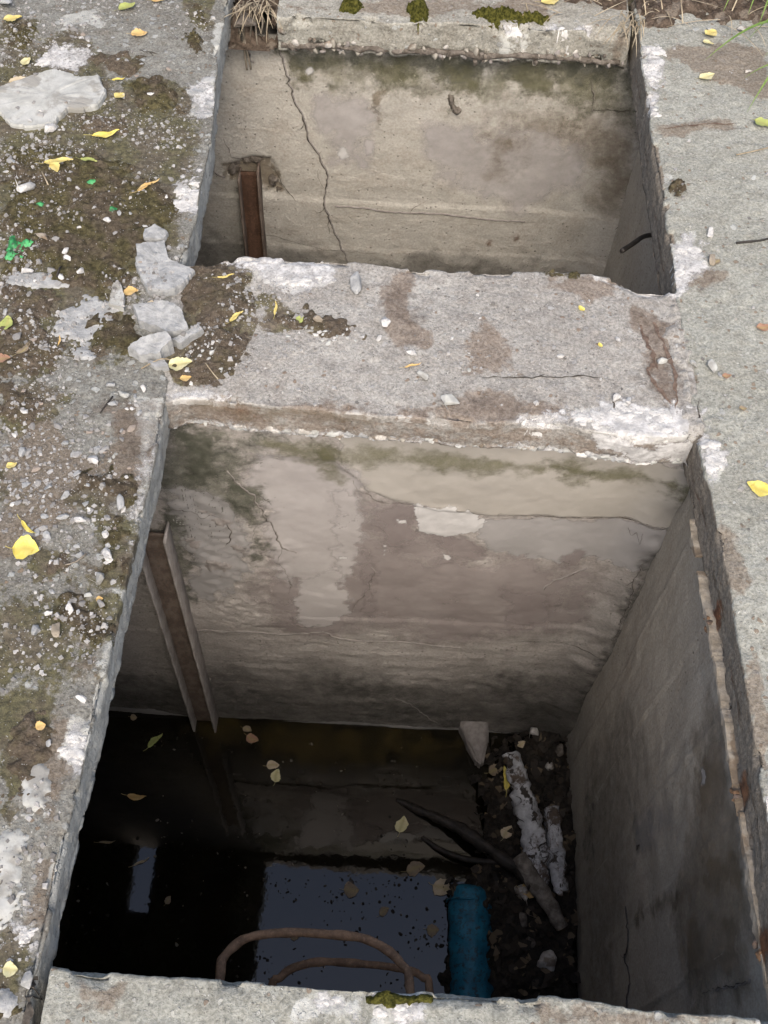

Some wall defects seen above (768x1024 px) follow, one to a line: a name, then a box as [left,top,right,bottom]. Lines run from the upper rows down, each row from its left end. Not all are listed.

water stain [292,49,324,81]
water stain [389,55,488,92]
water stain [502,23,631,97]
crack [591,76,642,112]
flaking render [223,156,284,192]
crack [248,29,525,263]
water stain [426,126,582,211]
crack [479,374,615,408]
water stain [515,396,729,487]
crack [172,471,297,592]